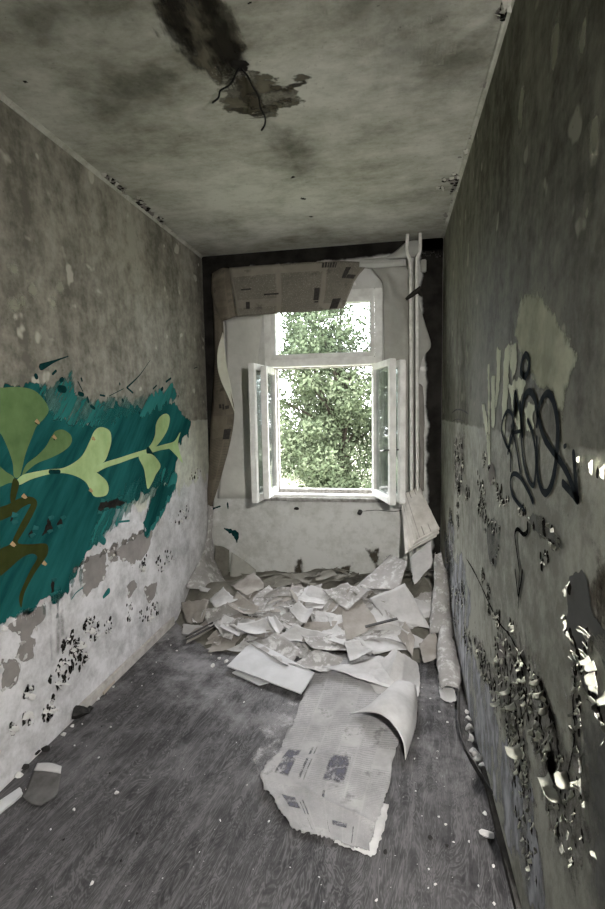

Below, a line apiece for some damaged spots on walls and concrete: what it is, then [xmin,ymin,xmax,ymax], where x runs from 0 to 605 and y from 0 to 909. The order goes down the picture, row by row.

water stain [153,0,311,118]
flaking render [494,0,513,21]
peeling [202,240,411,455]
flaking render [81,528,175,622]
flaking render [420,238,605,909]